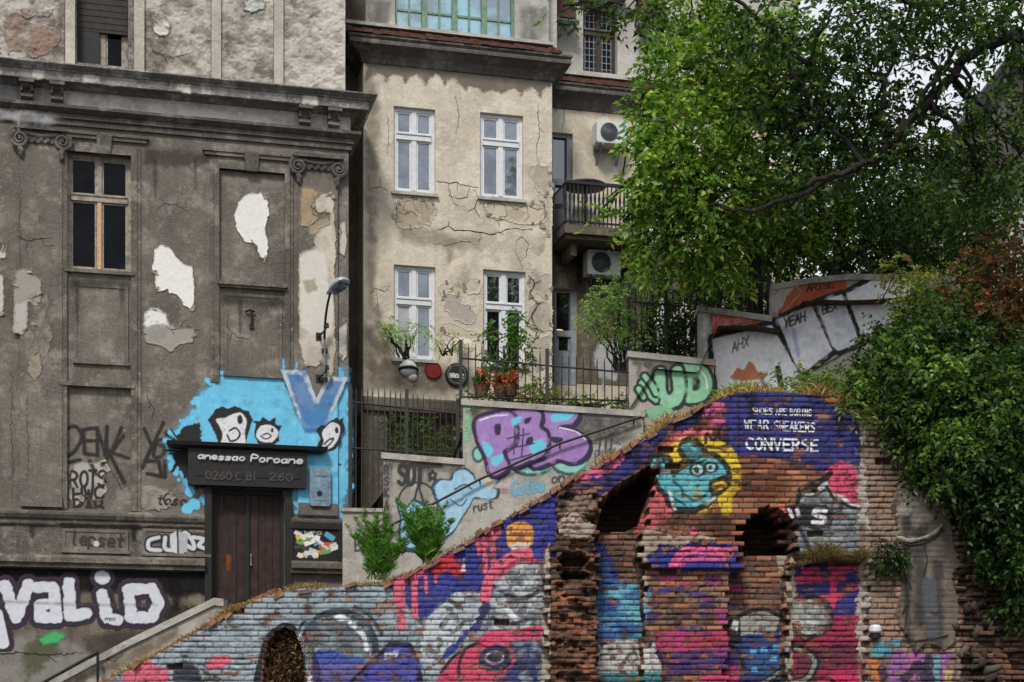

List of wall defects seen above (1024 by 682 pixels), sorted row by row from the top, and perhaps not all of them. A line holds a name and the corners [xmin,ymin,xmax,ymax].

flaking render [233,191,270,263]
flaking render [391,197,438,230]
flaking render [0,268,53,381]
flaking render [142,308,196,352]
flaking render [151,243,195,311]
flaking render [297,186,348,382]
crack [371,181,546,342]
flaking render [438,278,483,342]
spalling [555,495,596,540]
spalling [560,555,587,580]